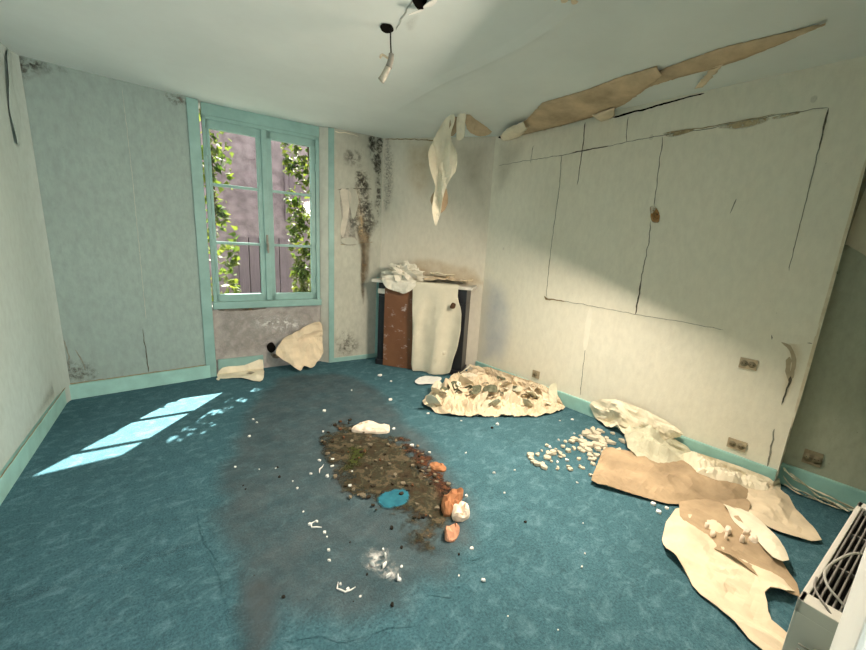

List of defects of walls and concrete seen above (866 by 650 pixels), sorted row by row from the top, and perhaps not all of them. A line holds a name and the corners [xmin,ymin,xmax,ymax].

damp [349,137,390,296]
damp [399,138,435,207]
peeling [428,114,457,226]
rust [650,206,660,223]
crack [499,93,829,395]
spalling [846,167,866,241]
peeling [770,311,819,344]